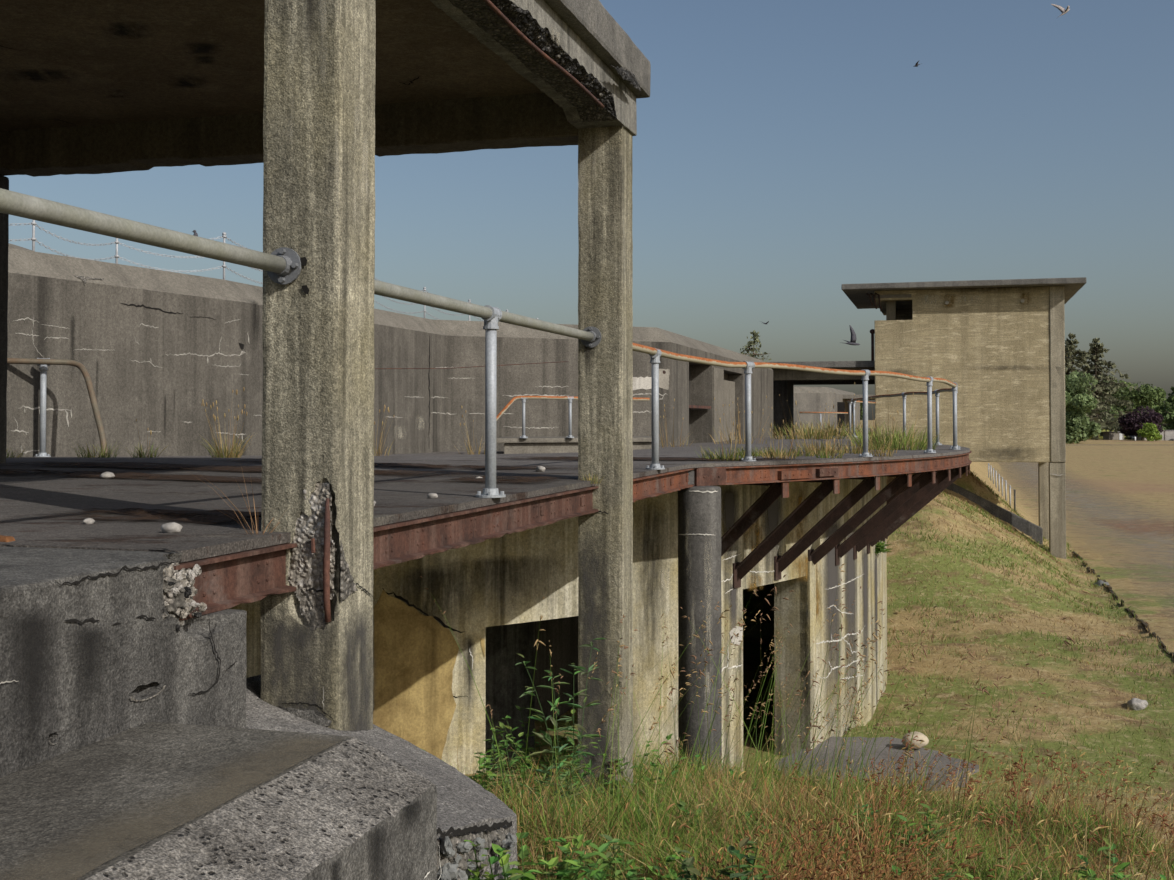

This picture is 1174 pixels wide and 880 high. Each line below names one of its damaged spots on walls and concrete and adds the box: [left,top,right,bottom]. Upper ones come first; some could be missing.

spalling [448,0,618,122]
crack [13,303,250,375]
leakage [22,617,46,718]
crack [64,615,156,625]
spalling [162,563,207,632]
crack [188,613,237,695]
spalling [288,483,358,630]
crack [304,583,473,698]
peeling [373,590,459,759]